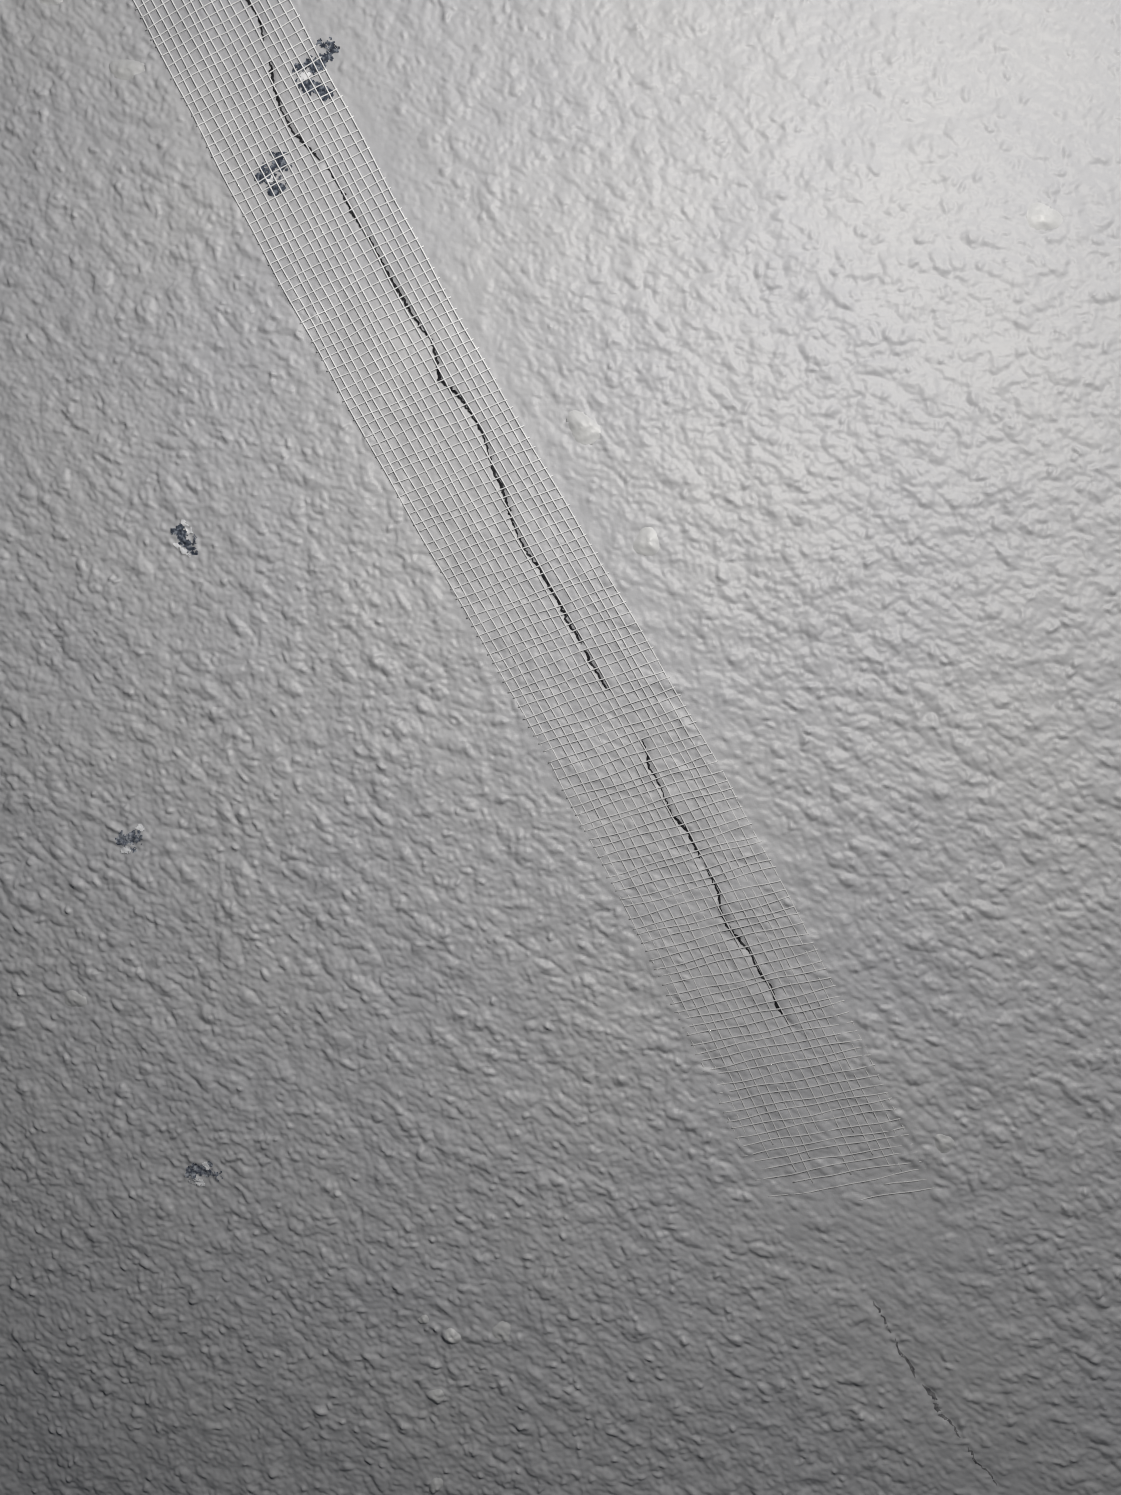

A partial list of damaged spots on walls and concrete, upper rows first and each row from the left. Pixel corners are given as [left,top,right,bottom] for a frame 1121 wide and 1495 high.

crack [246,0,607,689]
crack [642,740,788,1020]